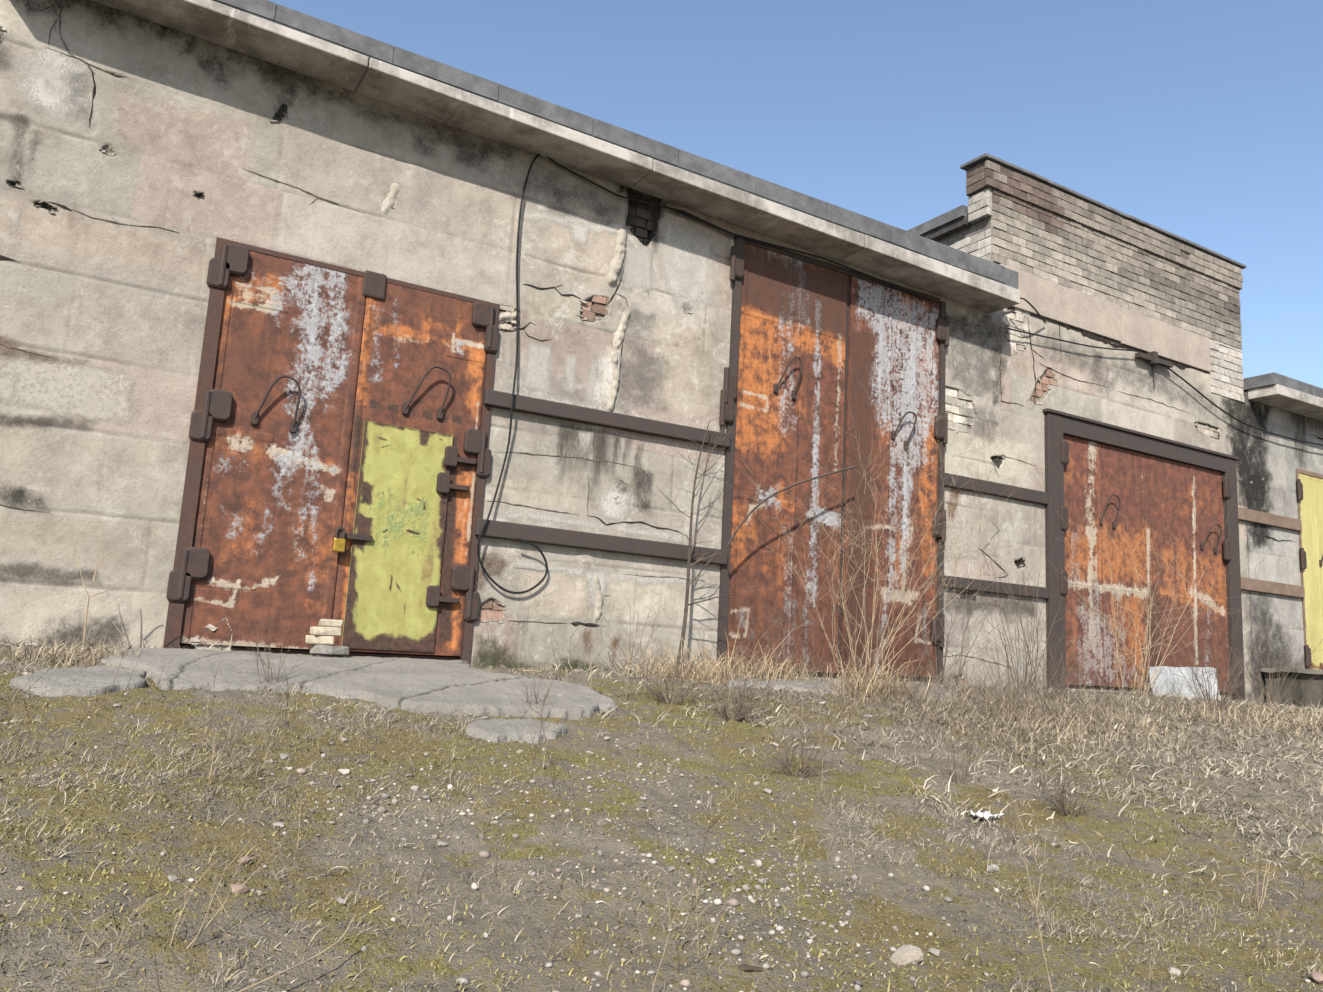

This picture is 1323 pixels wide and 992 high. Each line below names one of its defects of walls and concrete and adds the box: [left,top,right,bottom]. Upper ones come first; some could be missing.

crack [39,0,128,127]
crack [243,168,364,213]
crack [48,201,179,233]
crack [524,246,650,308]
spalling [577,295,609,322]
crack [499,321,551,341]
damp [0,564,96,582]